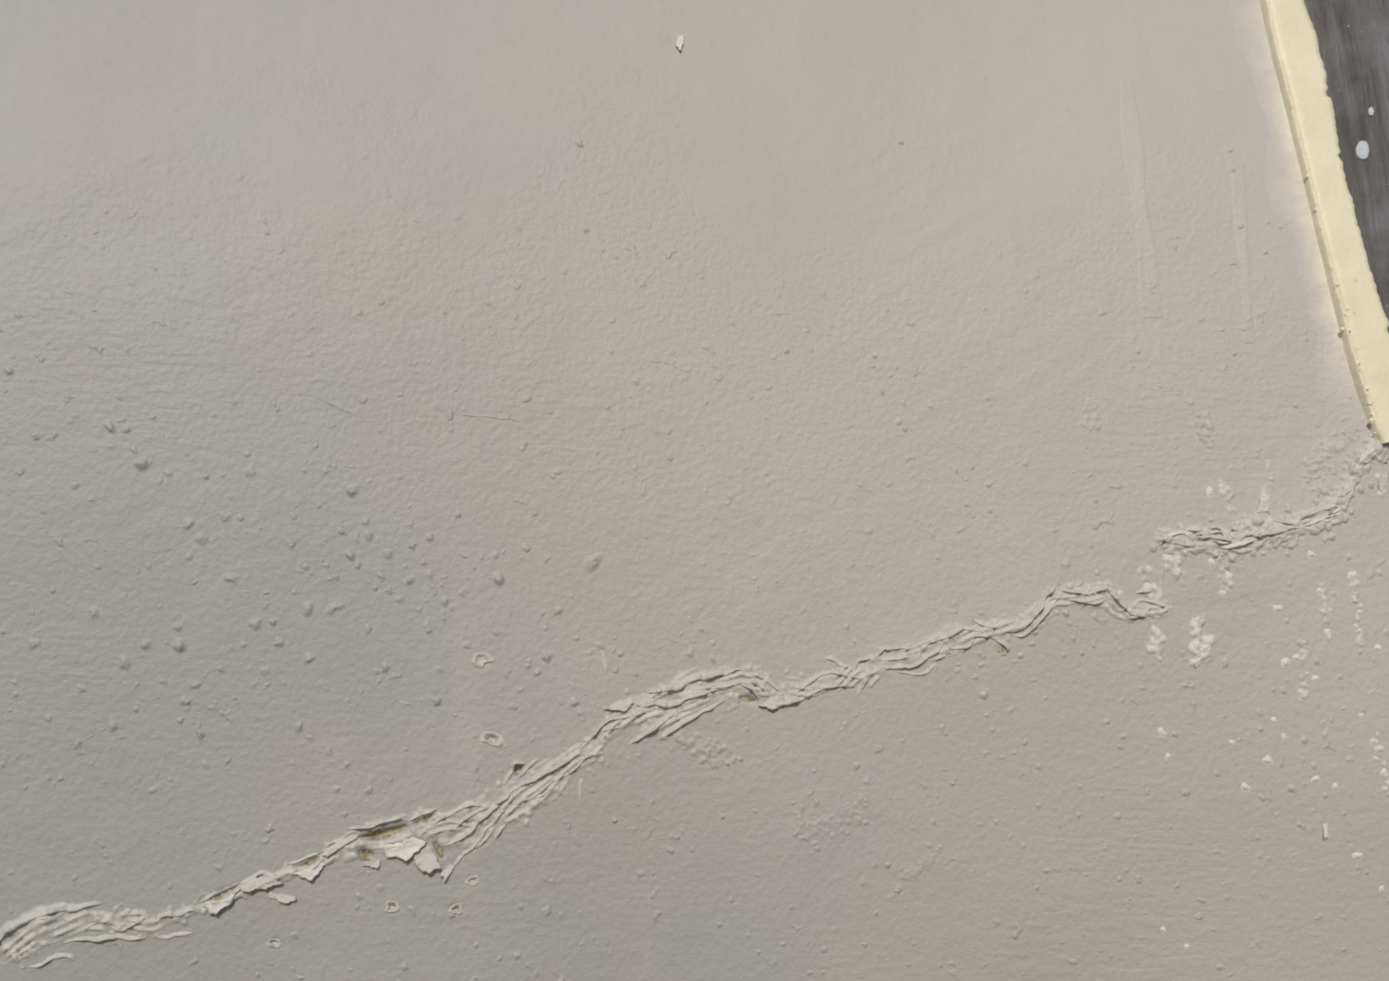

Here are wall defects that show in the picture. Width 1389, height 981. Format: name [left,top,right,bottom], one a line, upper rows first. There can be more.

crack [0,436,1389,972]